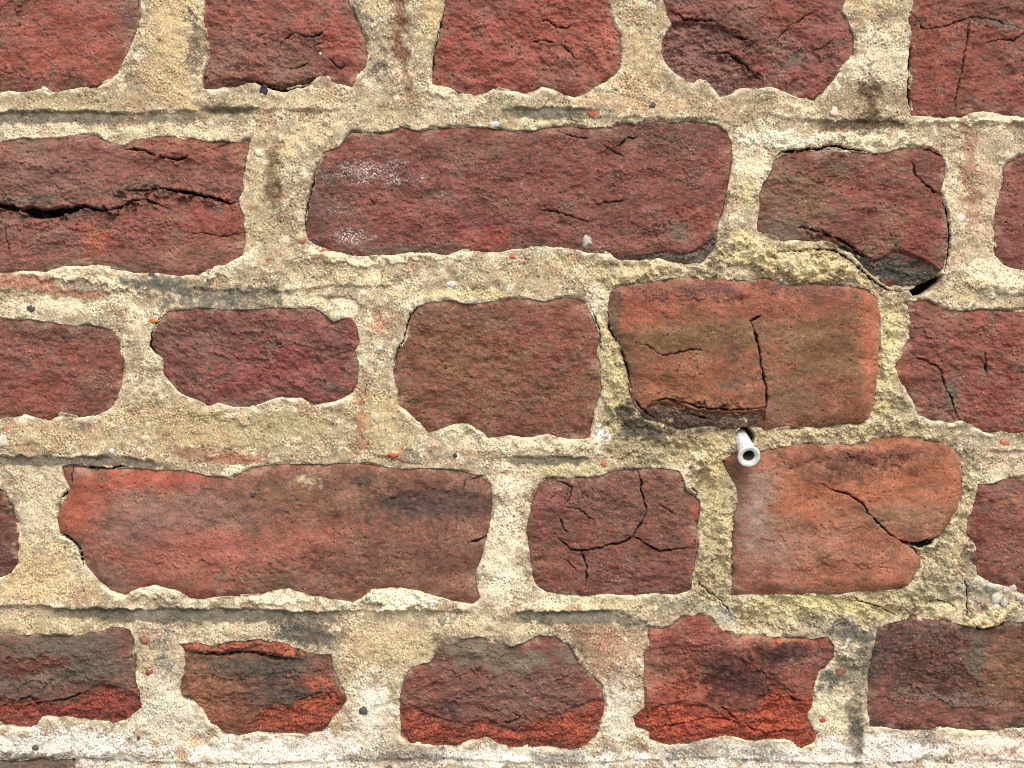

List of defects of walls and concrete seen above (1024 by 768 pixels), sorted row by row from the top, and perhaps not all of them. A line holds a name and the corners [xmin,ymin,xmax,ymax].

crack [907,12,1023,110]
crack [0,188,240,254]
crack [912,148,950,272]
crack [793,226,906,294]
crack [591,310,767,419]
crack [551,470,697,590]
crack [821,484,937,555]
spalling [180,640,305,657]
spalling [0,683,141,727]
spalling [249,685,346,735]
spalling [400,697,604,750]
spalling [633,685,826,748]